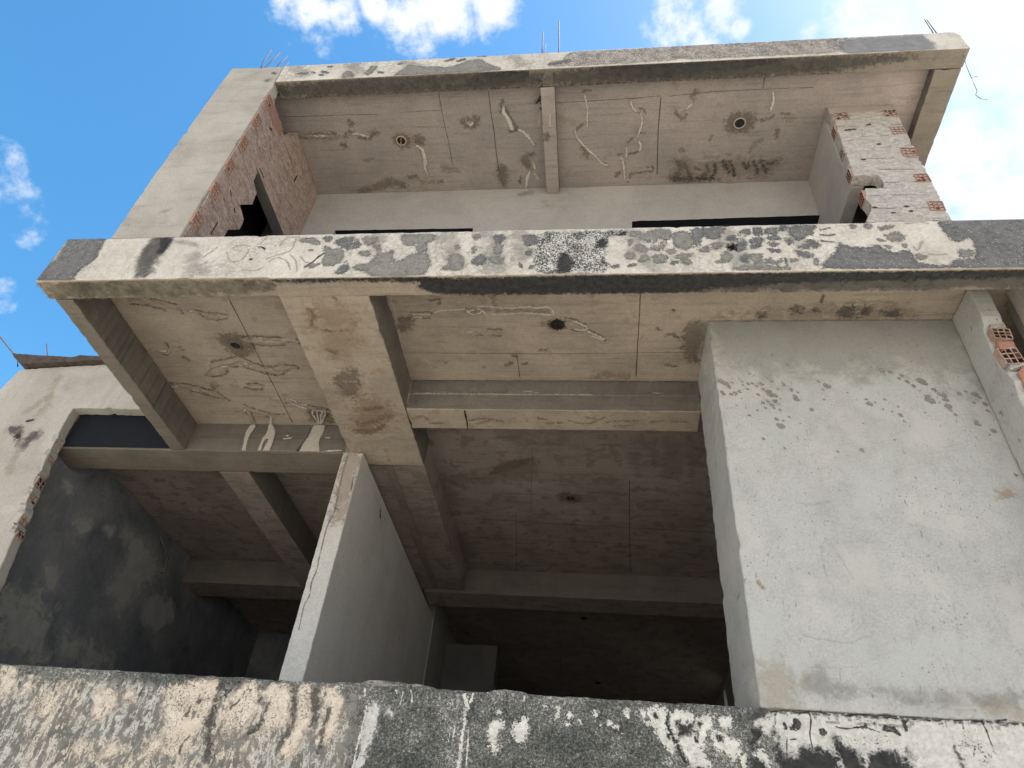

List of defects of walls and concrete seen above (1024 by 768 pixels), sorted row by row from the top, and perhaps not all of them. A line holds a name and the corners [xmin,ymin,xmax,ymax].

leakage [265,37,918,193]
crack [203,190,323,272]
peeling [299,232,539,276]
leakage [36,230,1024,341]
peeling [609,219,1024,271]
leakage [657,321,705,367]
leakage [9,426,40,447]
leakage [170,356,362,524]
peeling [486,707,530,756]
peeling [542,704,1024,768]